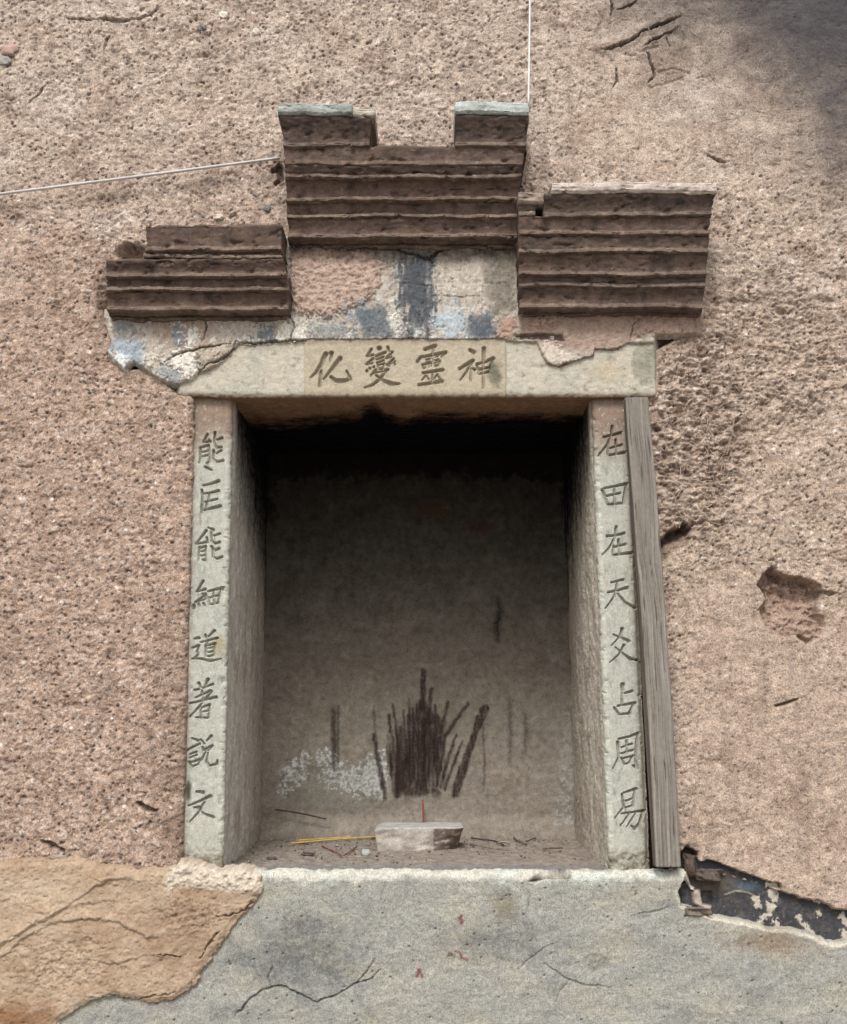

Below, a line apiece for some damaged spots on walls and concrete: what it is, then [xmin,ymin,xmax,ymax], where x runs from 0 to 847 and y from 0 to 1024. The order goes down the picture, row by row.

crack [609,0,636,16]
crack [601,15,681,88]
peeling [106,244,579,388]
damp [295,245,514,340]
spalling [757,565,838,645]
damp [277,746,390,801]
peeling [667,845,847,940]
crack [158,901,254,959]
crack [107,991,176,1000]
crack [234,958,382,1017]